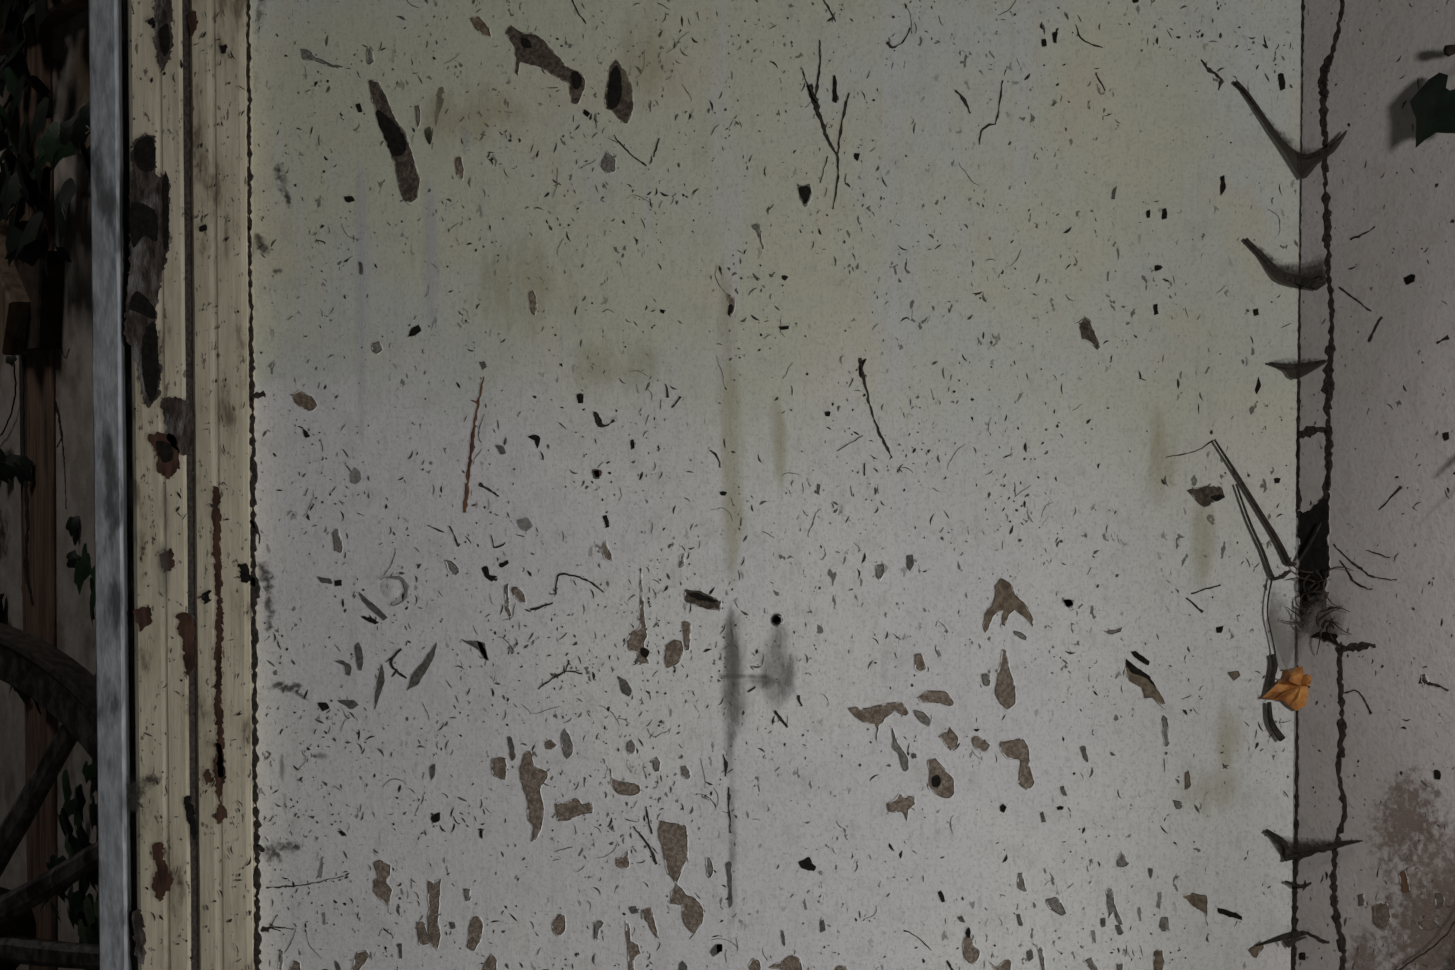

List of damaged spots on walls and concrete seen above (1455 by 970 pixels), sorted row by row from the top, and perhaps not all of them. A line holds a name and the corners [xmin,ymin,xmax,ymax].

spalling [300,48,444,203]
spalling [470,16,634,124]
crack [955,60,1020,186]
crack [1201,59,1239,90]
peeling [123,134,195,479]
crack [1268,0,1383,518]
spalling [981,577,1035,710]
crack [1333,544,1397,590]
spalling [491,728,594,842]
spalling [848,652,1035,821]
crack [1291,641,1376,970]
damp [1346,779,1455,970]